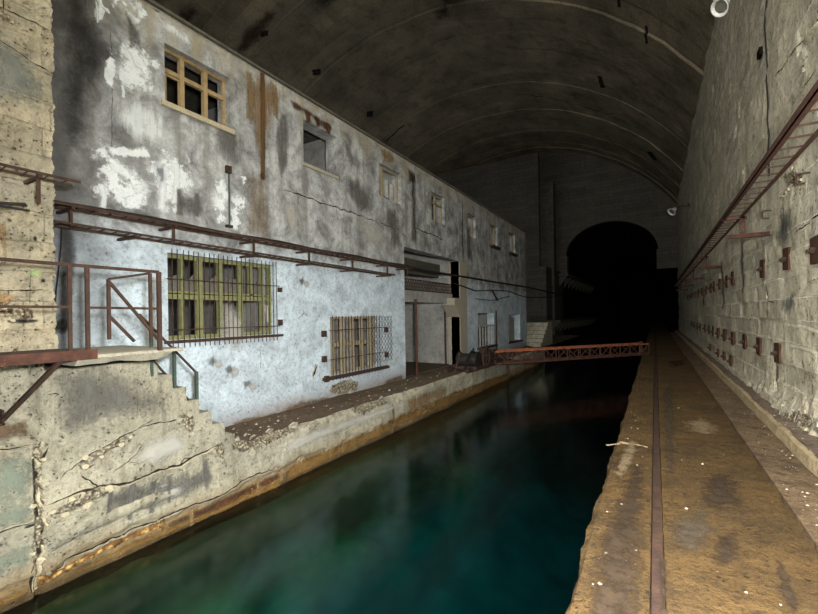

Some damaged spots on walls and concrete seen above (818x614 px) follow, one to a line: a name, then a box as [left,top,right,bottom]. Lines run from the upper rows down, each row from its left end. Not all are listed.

crack [3,0,49,30]
crack [0,40,49,72]
peeling [104,52,117,87]
peeling [127,48,160,79]
corrosion [247,73,278,180]
peeling [92,145,150,209]
crack [0,399,282,593]